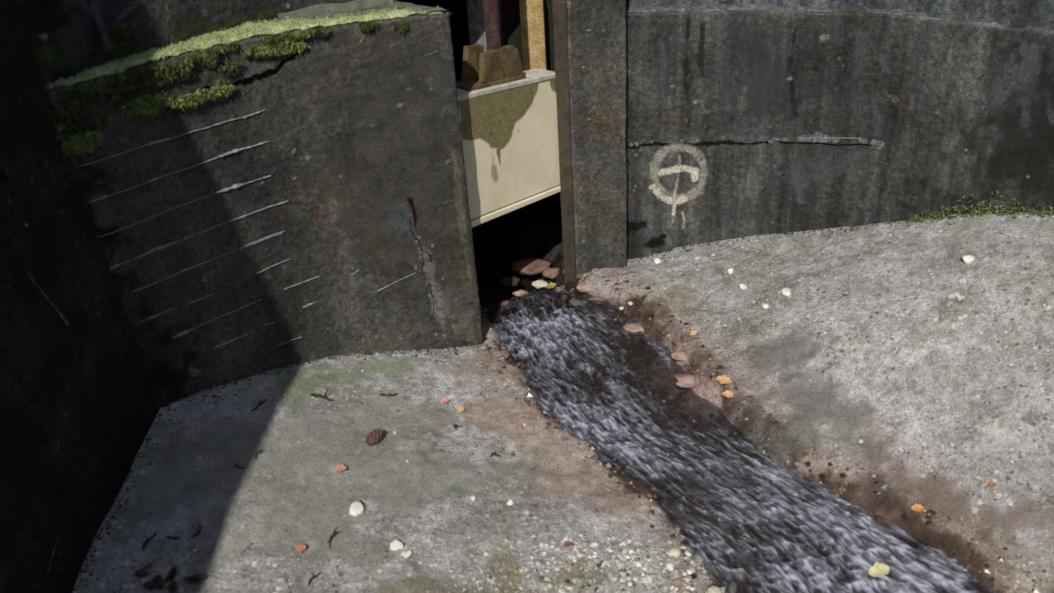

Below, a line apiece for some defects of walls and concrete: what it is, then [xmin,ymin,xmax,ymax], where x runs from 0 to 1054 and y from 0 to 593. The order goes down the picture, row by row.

crack [184,53,297,99]
crack [626,138,876,149]